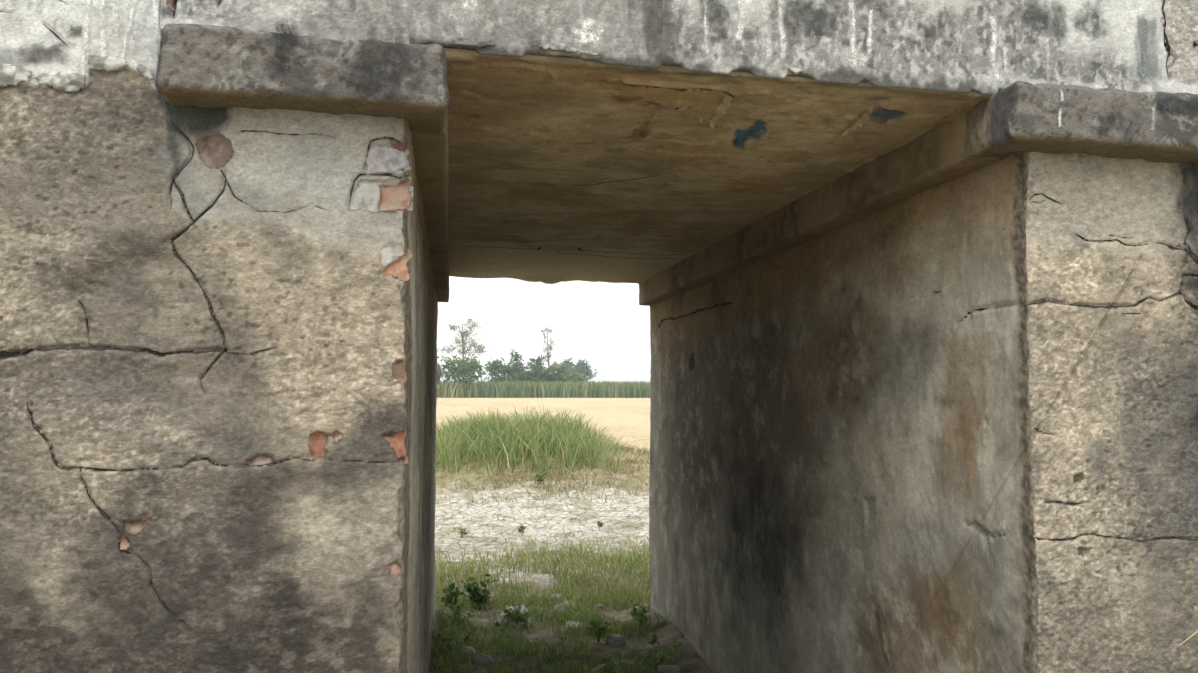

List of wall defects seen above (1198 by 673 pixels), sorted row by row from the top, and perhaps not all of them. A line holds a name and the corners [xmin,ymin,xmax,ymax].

efflorescence [735,0,786,58]
efflorescence [834,0,873,69]
efflorescence [990,16,1010,80]
leakage [1136,16,1158,79]
crack [1162,0,1176,75]
spalling [195,132,235,168]
flaking render [348,137,413,213]
flaking render [379,243,412,282]
flaking render [308,430,342,465]
crack [344,457,399,465]
crack [888,217,1198,673]
crack [27,403,314,635]